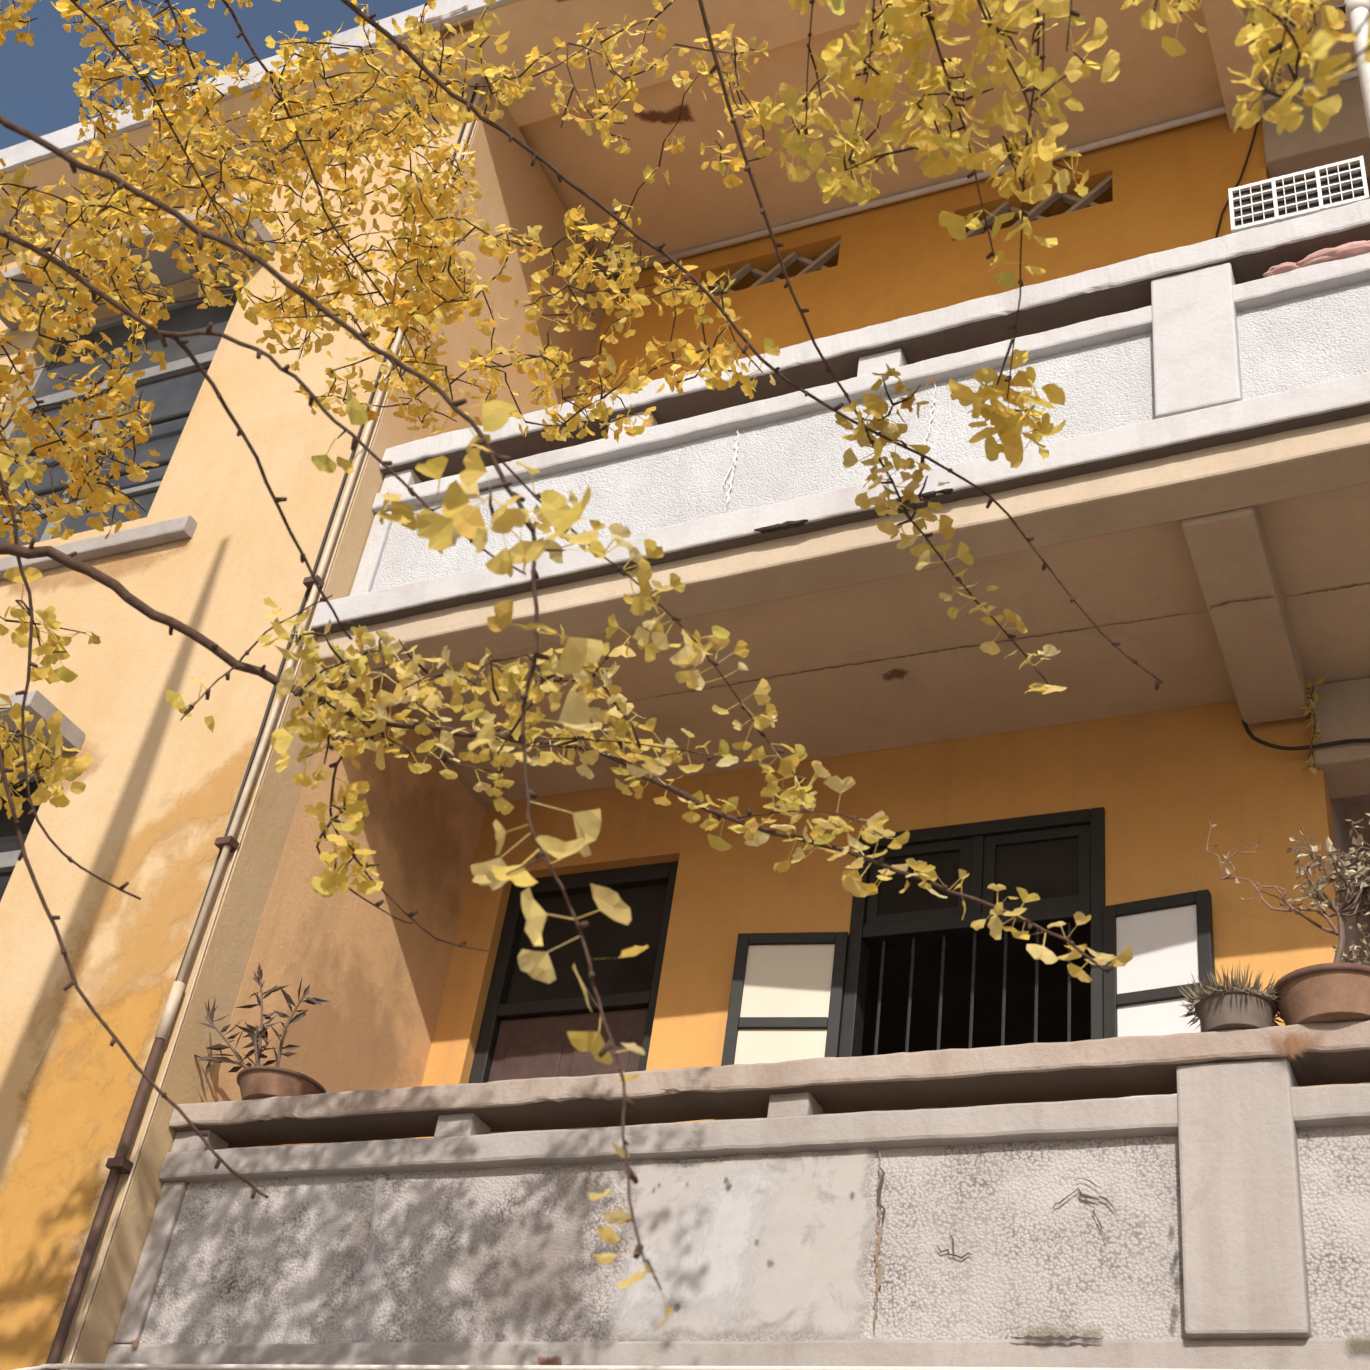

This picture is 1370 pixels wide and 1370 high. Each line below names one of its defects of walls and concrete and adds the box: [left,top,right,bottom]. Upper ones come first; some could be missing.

crack [634,583,1370,701]
crack [873,1152,885,1330]
crack [1053,1178,1115,1235]